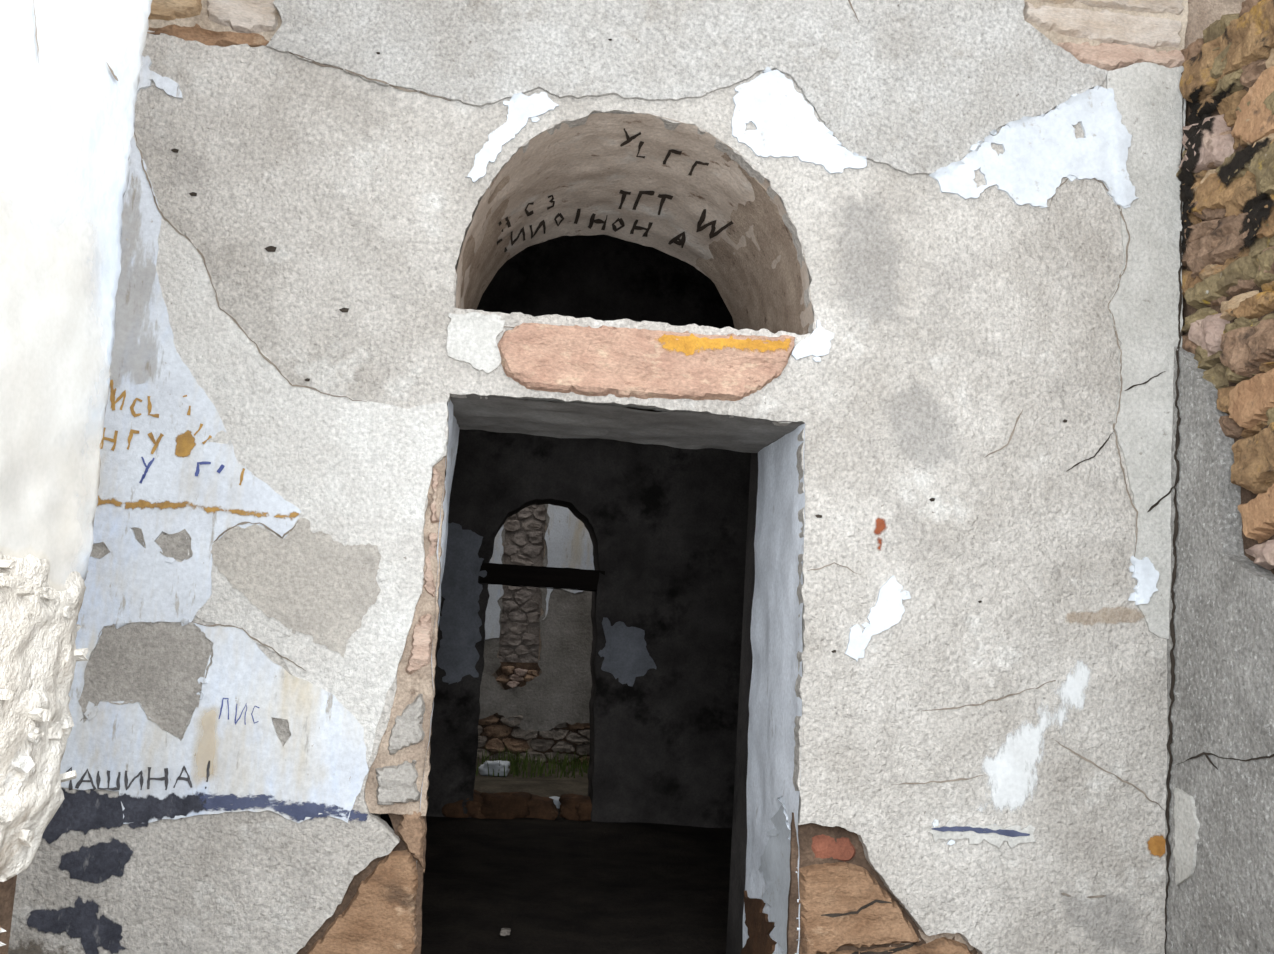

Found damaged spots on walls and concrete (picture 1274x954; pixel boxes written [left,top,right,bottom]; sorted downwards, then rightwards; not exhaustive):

flaking render [147,0,282,47]
peeling [465,92,559,183]
peeling [731,67,867,174]
peeling [929,85,1139,209]
flaking render [1023,0,1274,570]
peeling [446,312,506,374]
crack [984,410,1023,458]
crack [1050,98,1274,954]
peeling [928,661,1090,848]
crack [821,900,891,917]
flaking render [741,796,978,954]
crack [852,942,917,954]